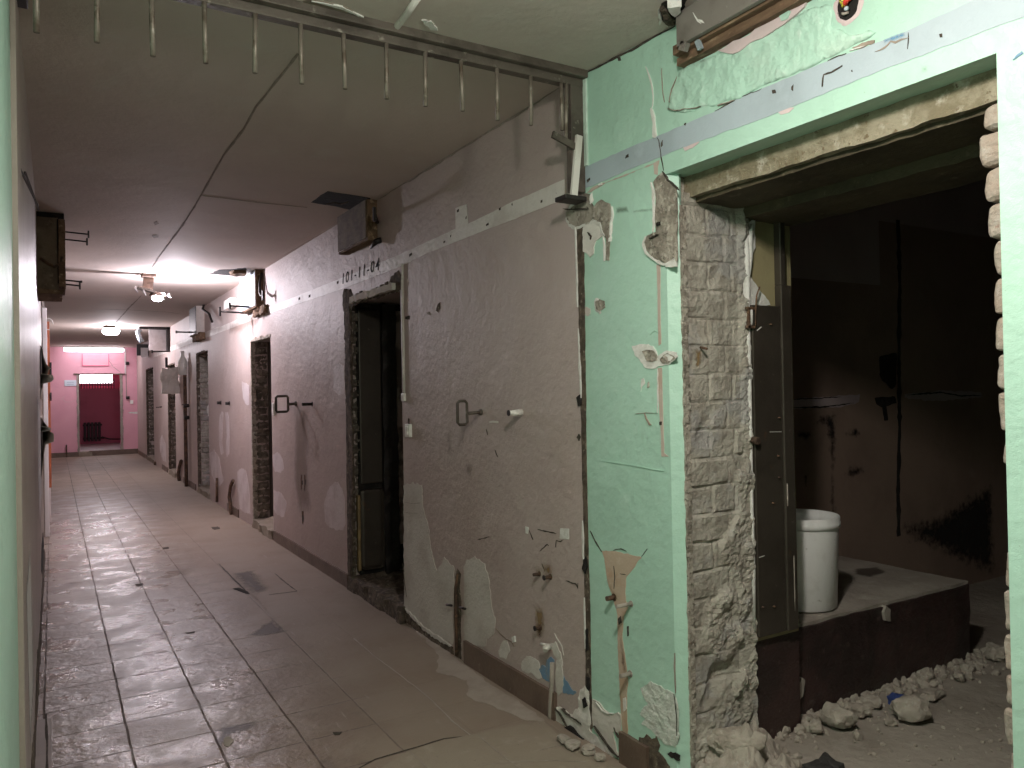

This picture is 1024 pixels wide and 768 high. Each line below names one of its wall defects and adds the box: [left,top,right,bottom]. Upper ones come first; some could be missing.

peeling [718,3,808,54]
peeling [849,40,875,51]
flaking render [521,160,770,768]
peeling [402,482,516,659]